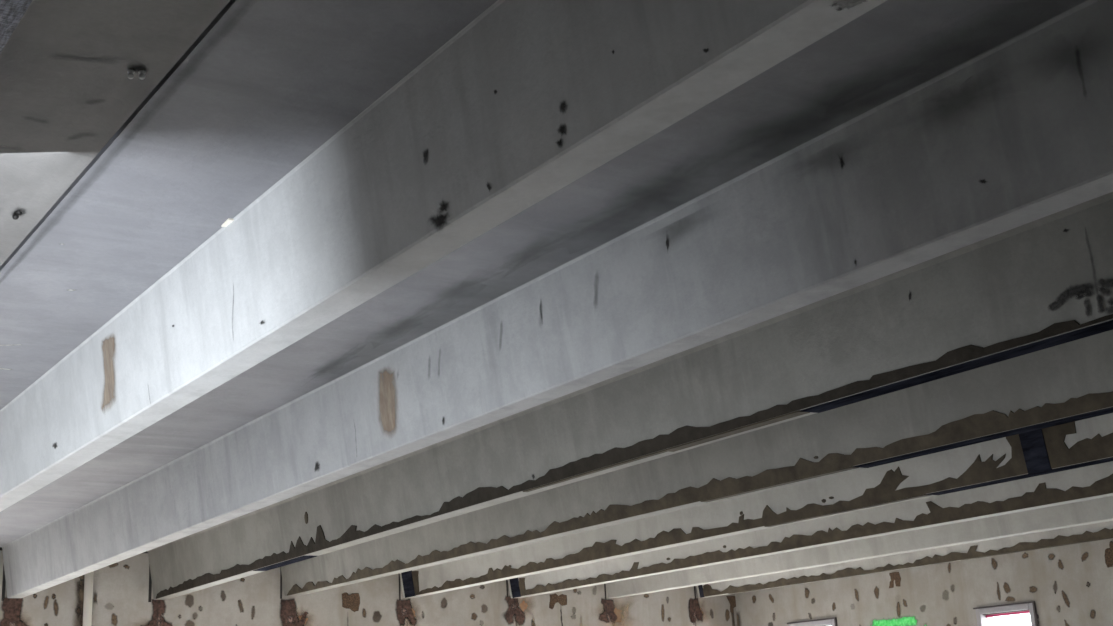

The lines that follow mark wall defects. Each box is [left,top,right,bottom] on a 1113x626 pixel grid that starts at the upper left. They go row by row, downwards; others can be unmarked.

corrosion [102,336,115,410]
corrosion [379,370,396,433]
spalling [1105,542,1113,568]
corrosion [0,597,27,626]
corrosion [141,599,172,626]
corrosion [280,599,309,626]
corrosion [396,599,417,626]
corrosion [599,599,628,626]